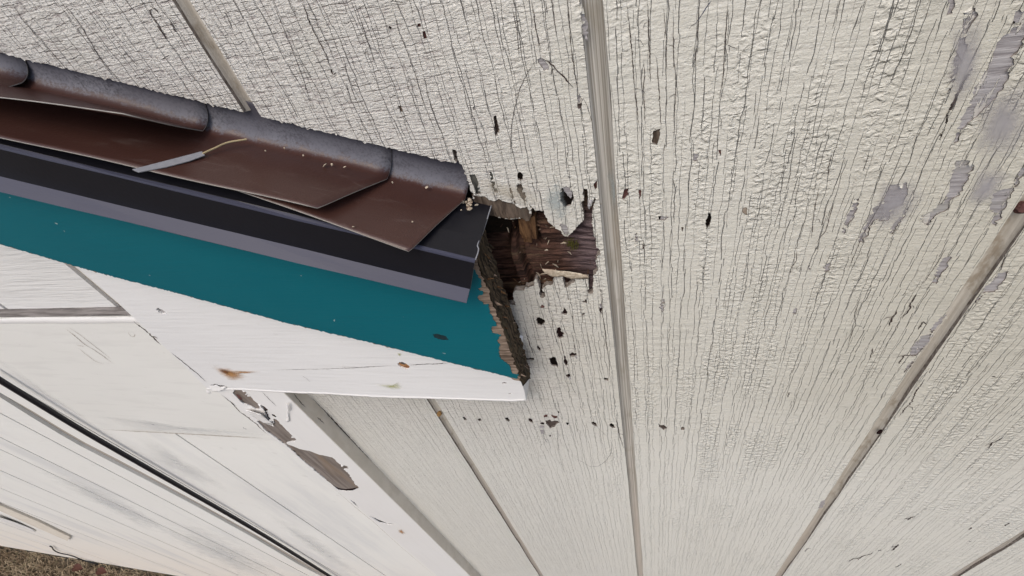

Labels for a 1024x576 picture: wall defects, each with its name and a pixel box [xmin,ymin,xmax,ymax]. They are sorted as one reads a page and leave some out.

crack [303,3,361,110]
crack [510,2,592,159]
crack [626,4,699,137]
crack [719,7,735,100]
peeling [939,0,1024,142]
peeling [470,172,532,221]
crack [790,156,835,272]
peeling [842,182,909,243]
peeling [919,160,974,225]
peeling [988,167,1024,226]
crack [847,247,947,358]
peeling [210,385,359,491]